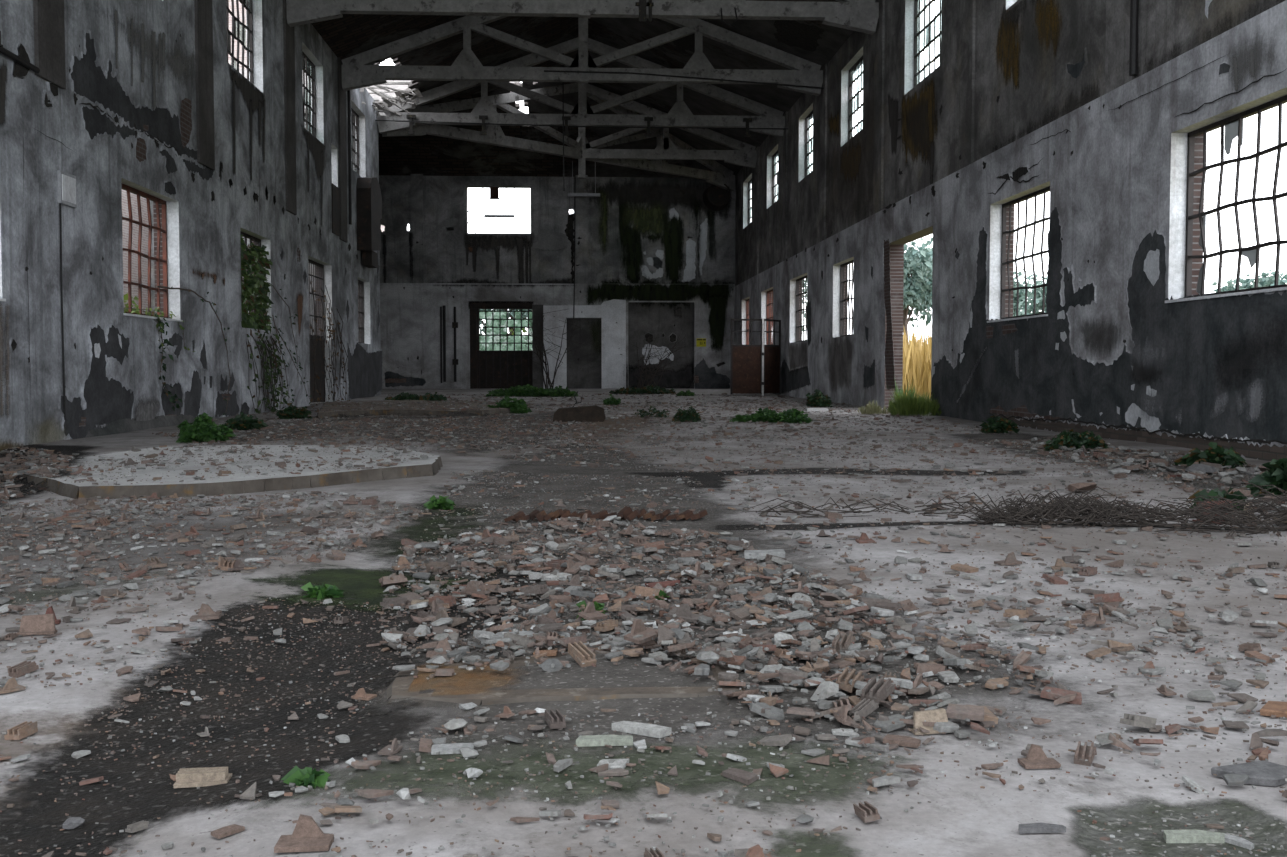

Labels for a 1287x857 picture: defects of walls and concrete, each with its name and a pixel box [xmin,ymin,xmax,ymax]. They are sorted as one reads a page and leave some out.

spalling [11,43,30,79]
peeling [42,29,322,238]
peeling [58,323,135,439]
peeling [931,206,1287,461]